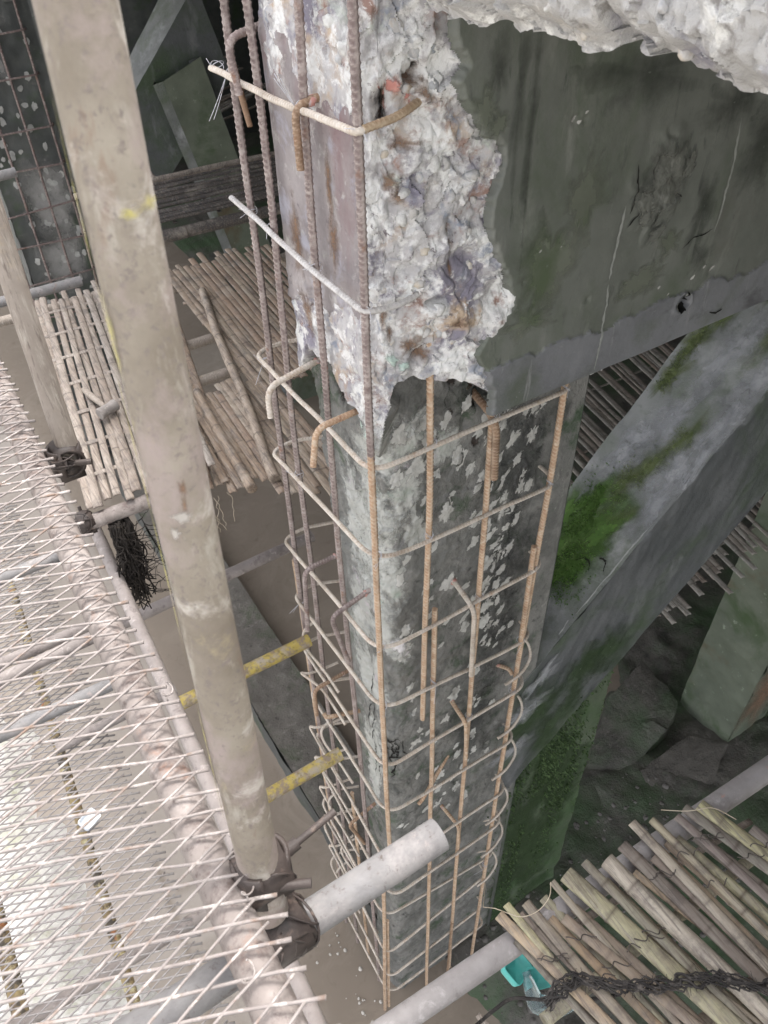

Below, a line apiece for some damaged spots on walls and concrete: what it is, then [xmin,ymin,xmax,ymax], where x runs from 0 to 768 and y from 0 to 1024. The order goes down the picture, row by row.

spalling [258,0,768,647]
damp [599,329,762,509]
spalling [391,624,414,662]
spalling [406,681,462,750]
spalling [396,728,489,829]
damp [489,636,624,919]